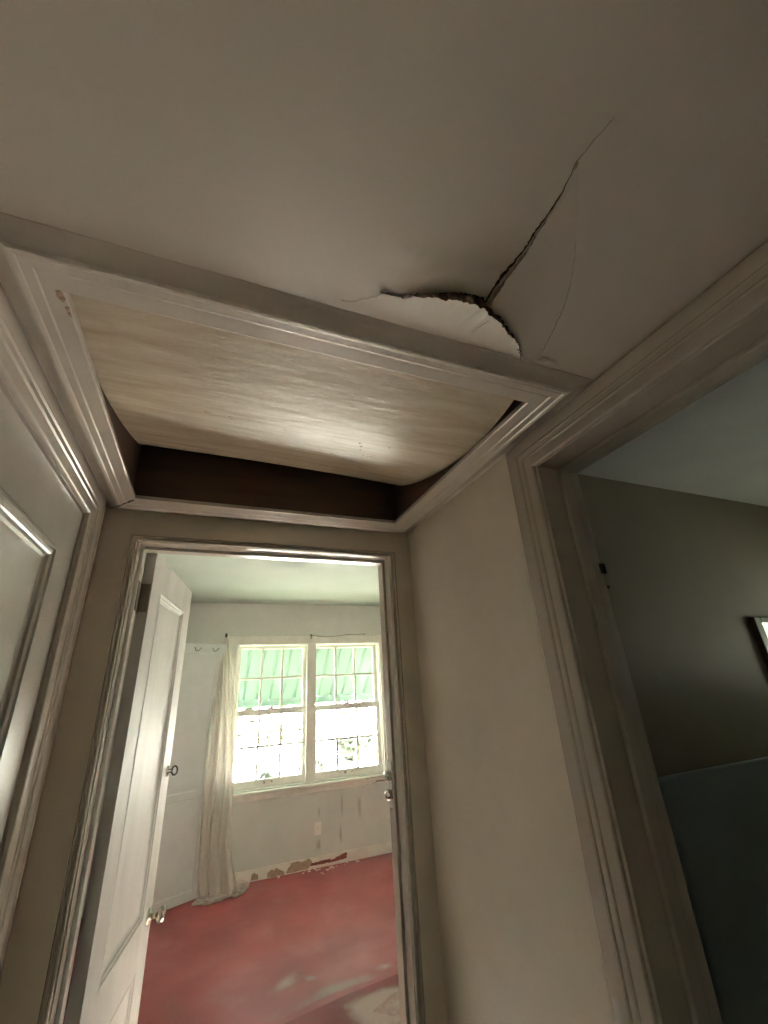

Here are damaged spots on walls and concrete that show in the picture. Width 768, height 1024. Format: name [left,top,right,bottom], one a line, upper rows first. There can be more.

crack [342,124,609,360]
peeling [251,859,312,881]